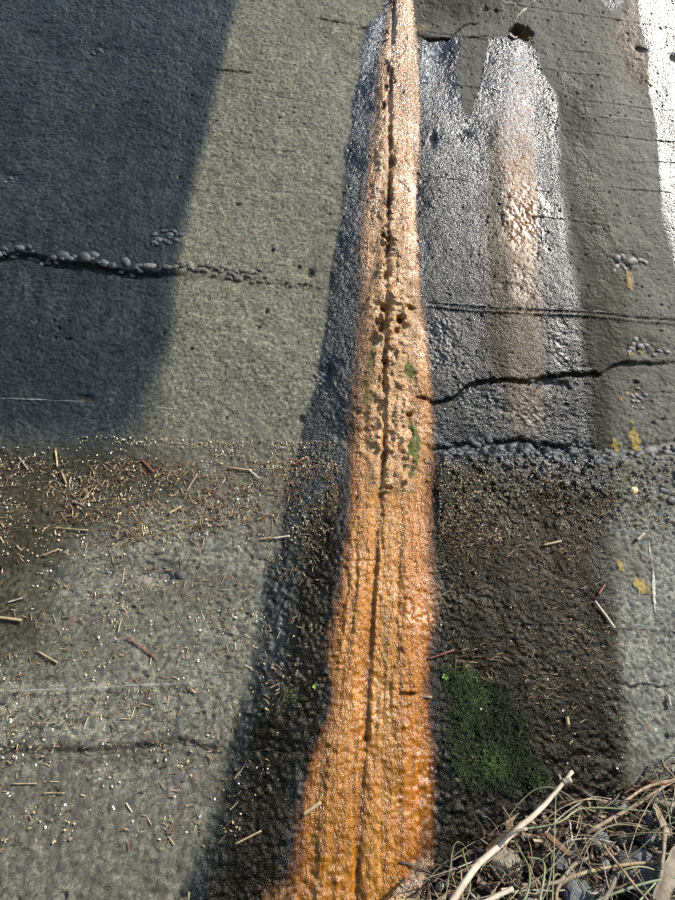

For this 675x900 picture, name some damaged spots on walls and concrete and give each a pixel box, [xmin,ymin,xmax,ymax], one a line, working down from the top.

crack [318,0,397,277]
water stain [361,0,392,80]
crack [416,1,534,42]
water stain [417,37,550,259]
rust [499,39,544,426]
water stain [639,0,675,146]
water stain [198,306,363,900]
rust [277,0,438,900]
crack [377,436,390,498]
crack [375,307,413,383]
water stain [416,255,620,899]
crack [406,359,674,417]